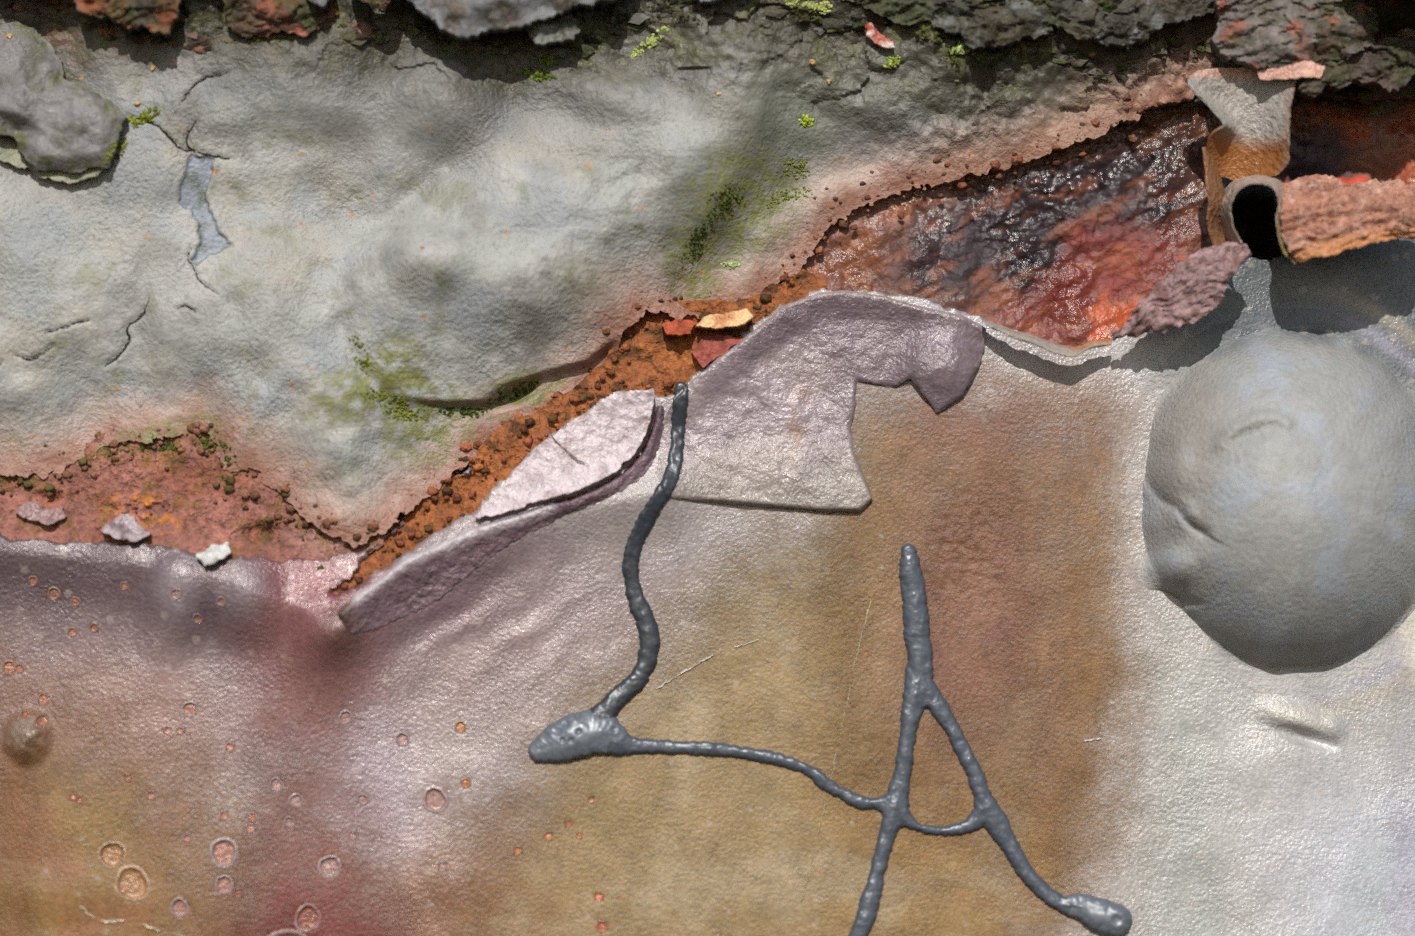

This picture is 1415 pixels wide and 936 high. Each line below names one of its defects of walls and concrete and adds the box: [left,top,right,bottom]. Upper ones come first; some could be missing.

crack [0,321,87,365]
crack [131,73,230,159]
rust [0,93,1223,594]
peeling [0,0,1415,634]